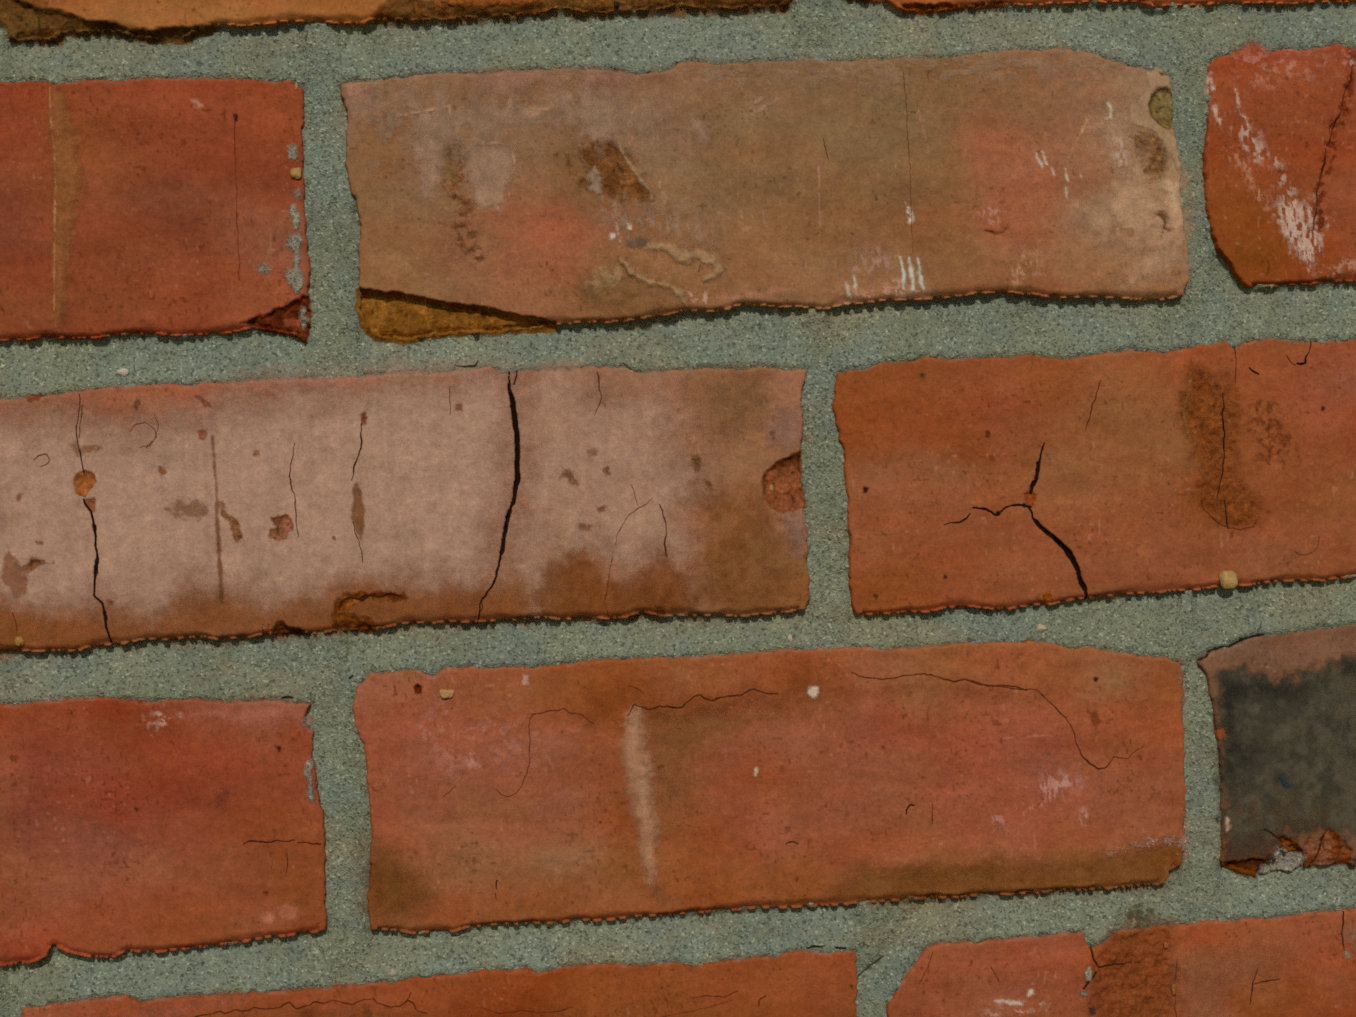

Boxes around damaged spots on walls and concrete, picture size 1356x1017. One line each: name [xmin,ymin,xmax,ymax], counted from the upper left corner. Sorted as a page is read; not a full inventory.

crack [1312,47,1356,231]
spalling [355,288,557,345]
crack [76,393,113,643]
crack [449,360,521,620]
crack [944,442,1088,599]